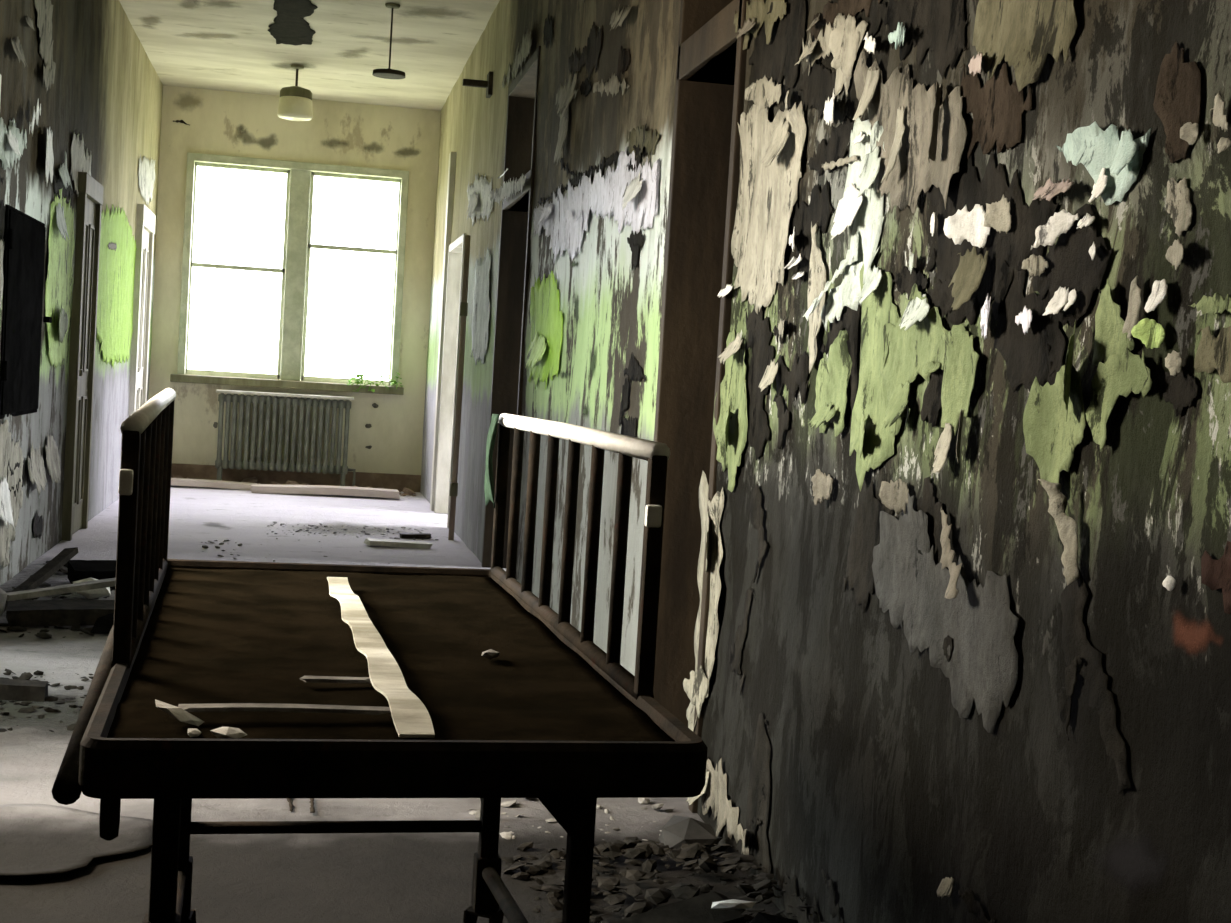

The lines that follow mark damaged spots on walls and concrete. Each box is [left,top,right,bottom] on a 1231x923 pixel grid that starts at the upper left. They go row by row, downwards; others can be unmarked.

spalling [268,0,318,46]
peeling [0,0,91,368]
peeling [96,204,137,368]
water stain [239,126,275,148]
peeling [471,247,492,366]
peeling [466,169,526,226]
peeling [526,123,660,389]
spalling [619,354,646,437]
peeling [683,0,1231,734]
peeling [0,419,61,570]
peeling [686,758,749,855]